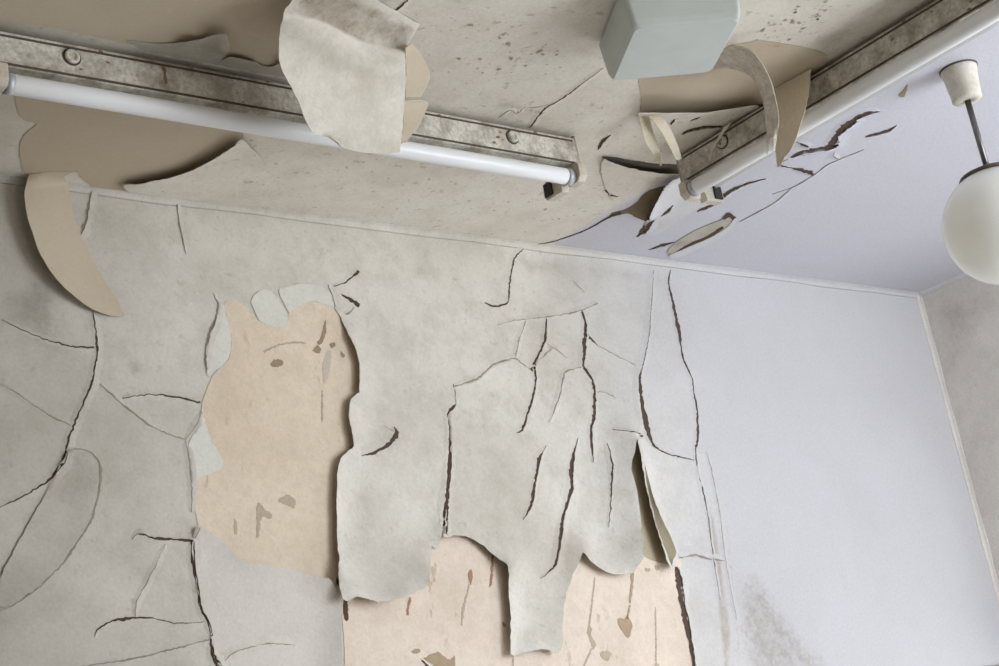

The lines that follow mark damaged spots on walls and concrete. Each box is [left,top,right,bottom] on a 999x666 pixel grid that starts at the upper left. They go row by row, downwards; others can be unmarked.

peeling [15,96,280,317]
crack [0,311,295,666]
crack [204,293,225,373]
peeling [0,0,430,154]
crack [396,0,413,13]
peeling [188,284,710,666]
crack [437,107,898,666]
peeling [667,213,736,259]
peeling [601,41,828,236]